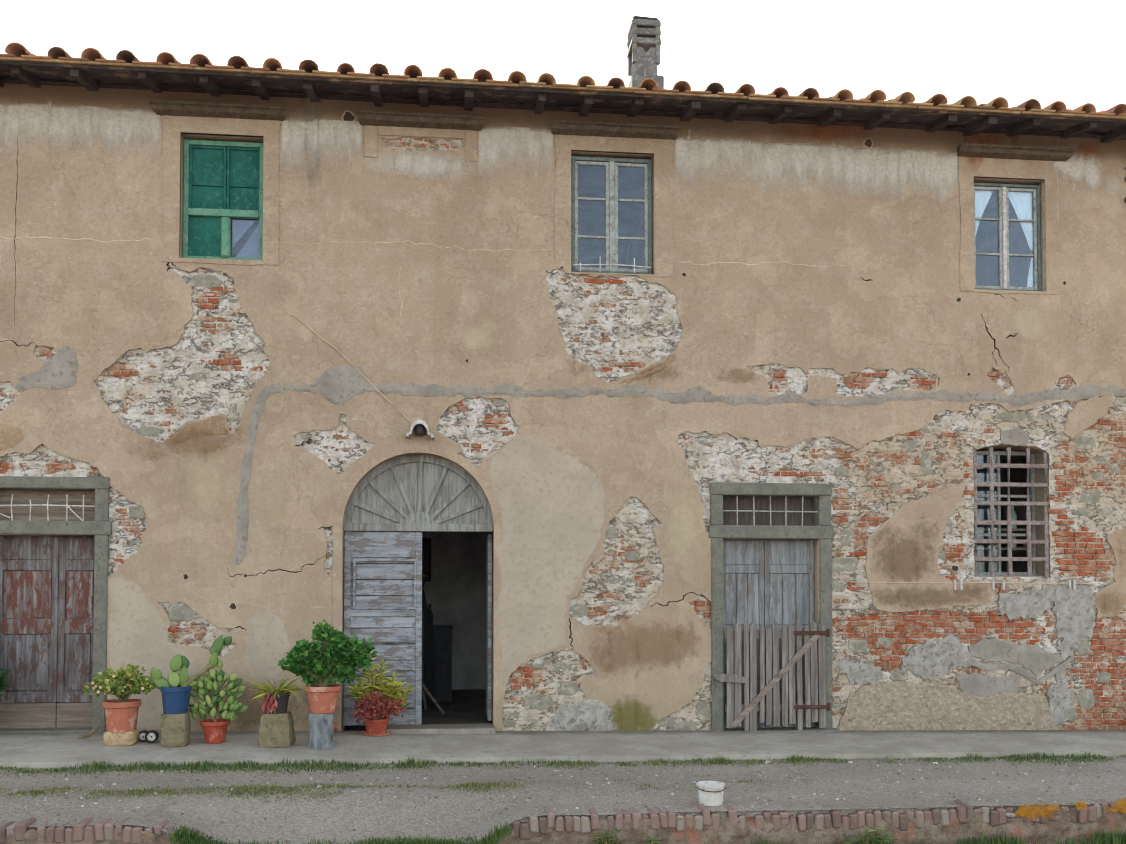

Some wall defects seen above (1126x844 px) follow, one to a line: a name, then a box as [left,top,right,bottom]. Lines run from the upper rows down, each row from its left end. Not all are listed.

flaking render [95,265,270,442]
flaking render [545,268,682,382]
crack [985,323,1019,367]
flaking render [293,413,376,474]
flaking render [436,397,519,468]
flaking render [0,444,147,576]
crack [227,526,332,577]
flaking render [569,497,664,627]
flaking render [677,363,1126,730]
flaking render [158,602,237,657]
flaking render [502,647,610,731]
flaking render [652,662,711,730]